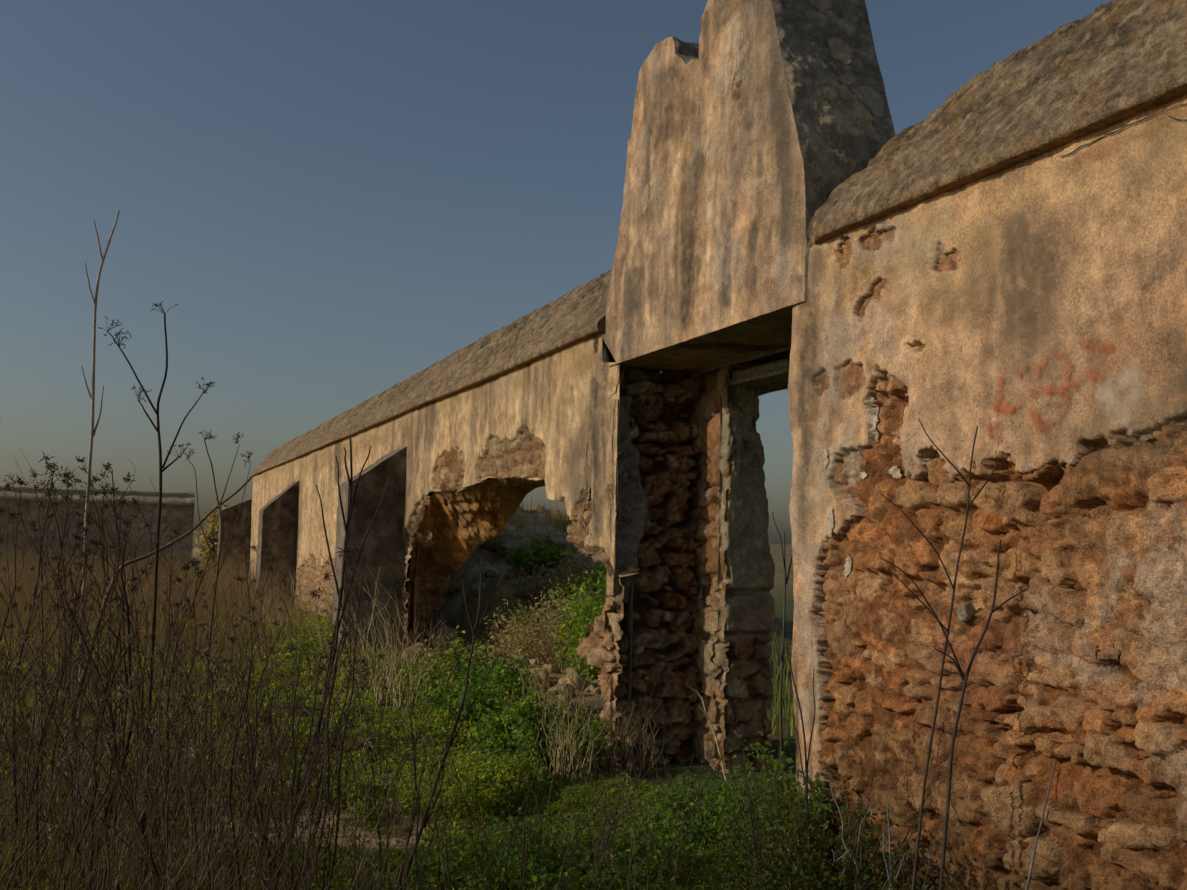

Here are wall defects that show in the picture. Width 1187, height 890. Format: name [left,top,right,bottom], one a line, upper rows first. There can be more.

crack [1061,103,1187,158]
flaking render [837,228,897,268]
spalling [400,426,546,658]
spalling [818,373,1187,890]